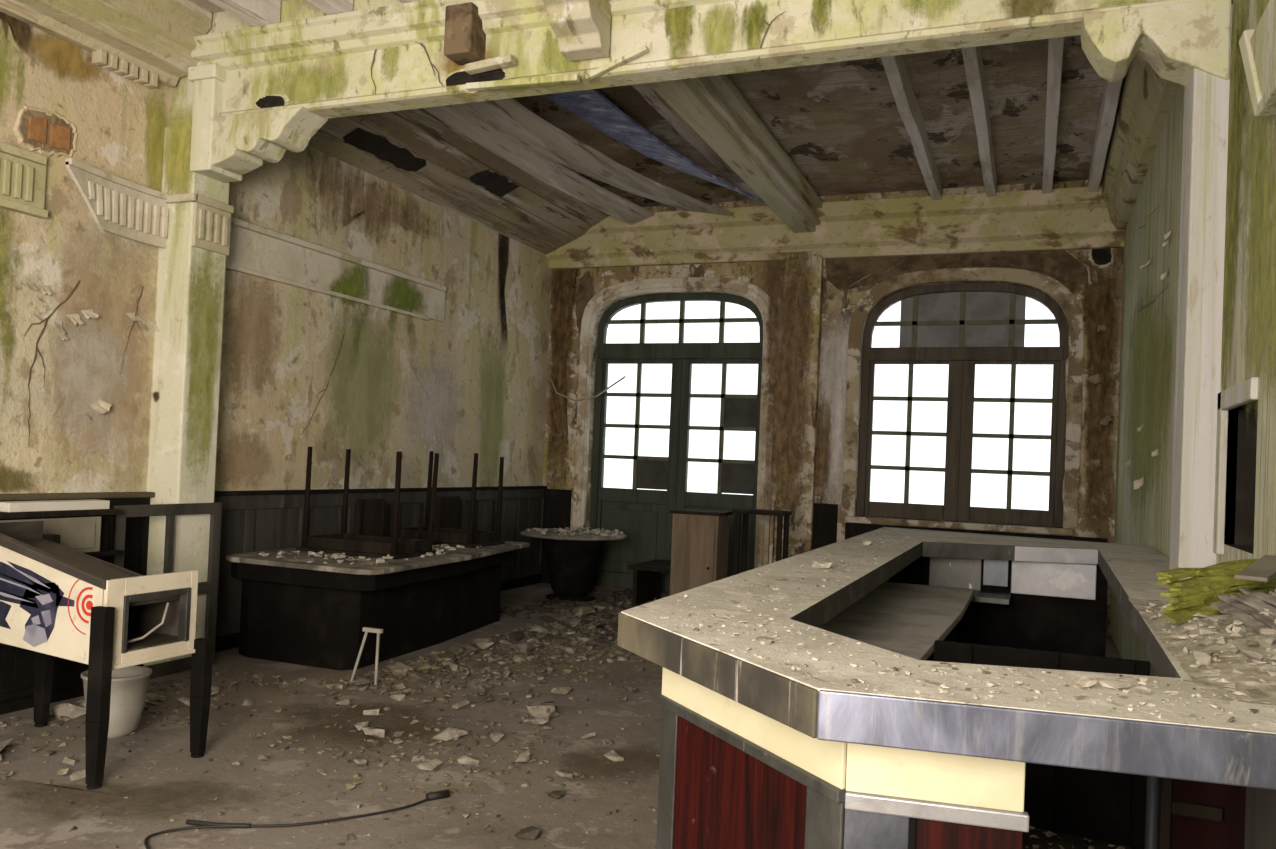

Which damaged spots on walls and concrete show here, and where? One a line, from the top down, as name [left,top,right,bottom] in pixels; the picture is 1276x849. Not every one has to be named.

damp [0,11,31,102]
flaking render [13,105,78,158]
flaking render [574,269,596,335]
damp [5,324,13,384]
crack [23,280,81,447]